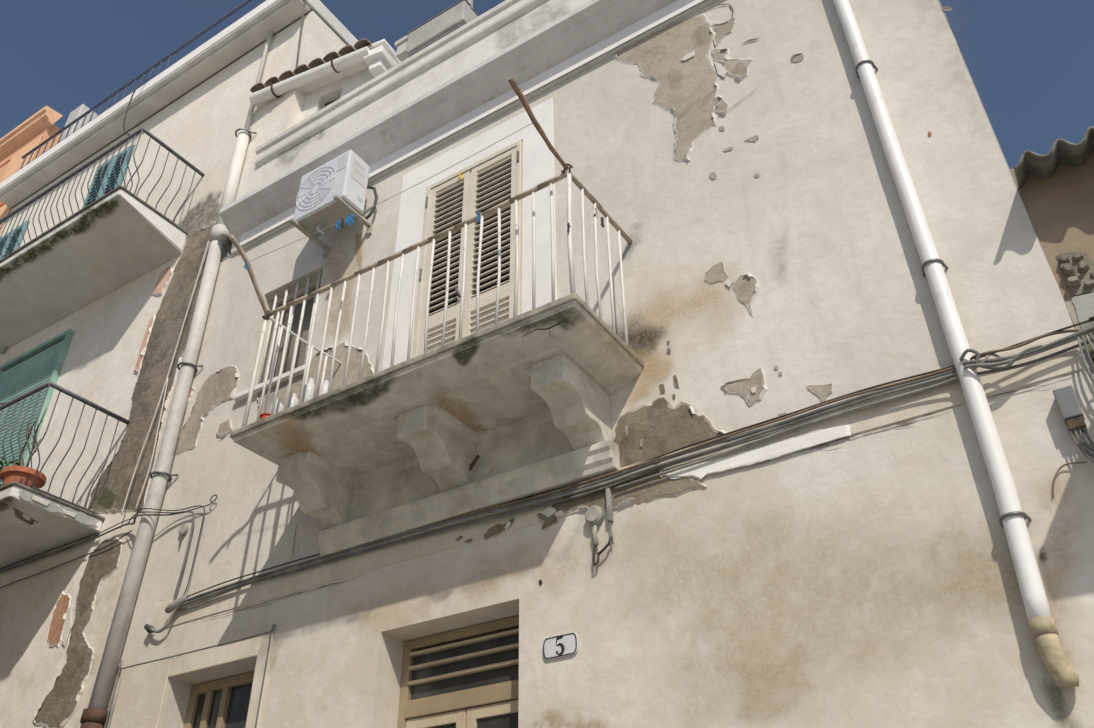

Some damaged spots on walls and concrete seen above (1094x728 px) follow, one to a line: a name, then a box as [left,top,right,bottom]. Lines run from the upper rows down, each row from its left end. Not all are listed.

peeling [612,4,760,162]
peeling [705,262,760,316]
peeling [13,222,216,526]
peeling [175,365,240,455]
leakage [620,328,658,350]
peeling [537,375,741,531]
peeling [721,366,783,407]
peeling [807,383,833,402]
peeling [456,518,515,543]
peeling [32,535,124,728]